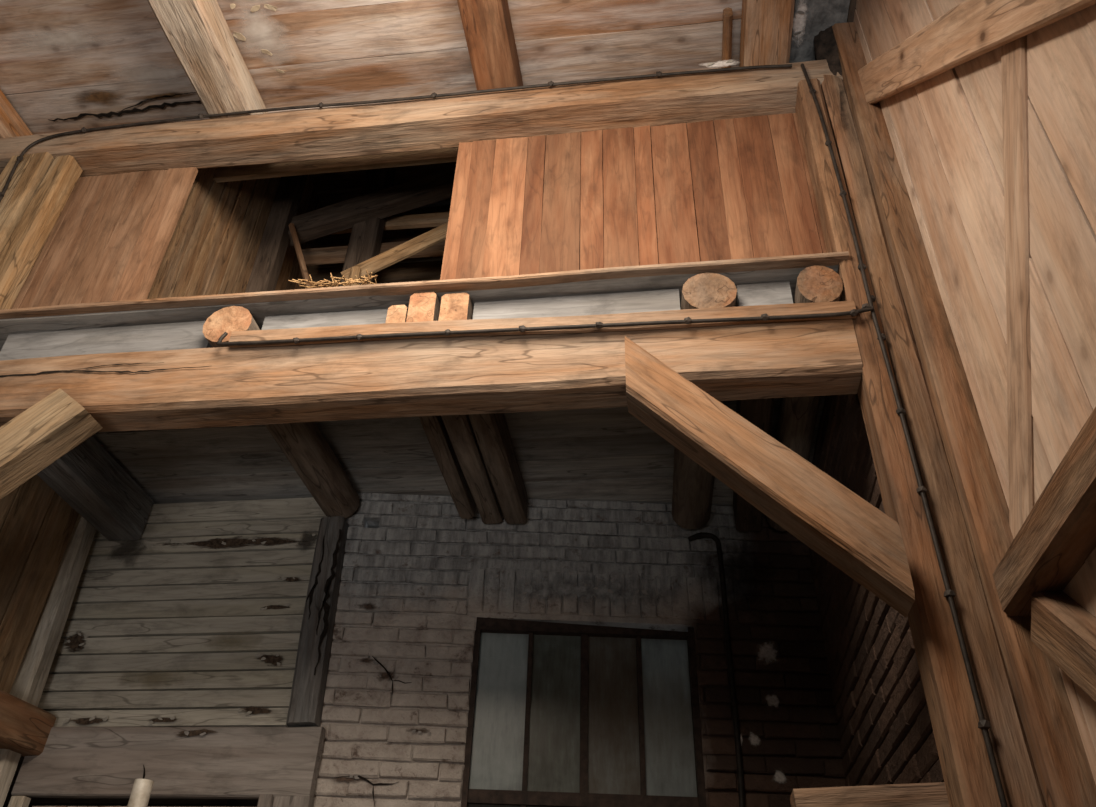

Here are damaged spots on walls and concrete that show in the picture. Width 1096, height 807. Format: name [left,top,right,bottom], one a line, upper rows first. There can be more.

crack [48,92,201,121]
peeling [164,536,298,549]
crack [306,529,341,675]